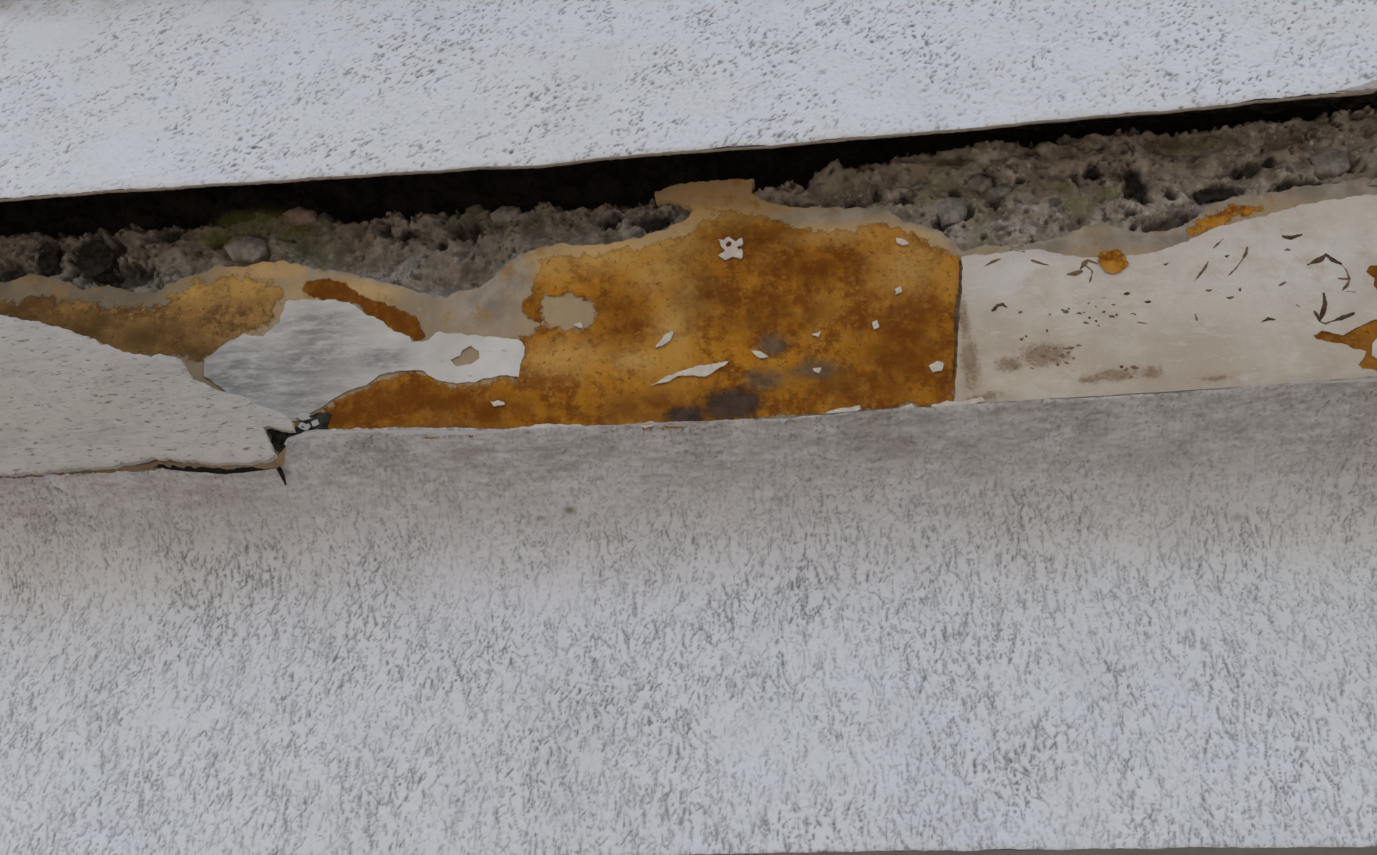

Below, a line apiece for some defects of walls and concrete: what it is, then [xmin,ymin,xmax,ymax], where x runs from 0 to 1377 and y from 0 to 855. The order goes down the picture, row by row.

rust [1186,204,1264,239]
peeling [0,80,1377,407]
rust [1366,266,1377,289]
rust [1314,320,1377,371]
peeling [0,299,525,477]
peeling [824,405,862,414]
crack [148,464,287,485]